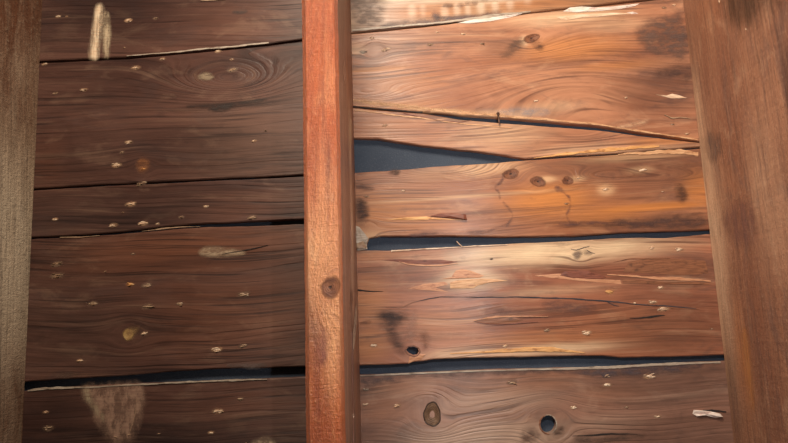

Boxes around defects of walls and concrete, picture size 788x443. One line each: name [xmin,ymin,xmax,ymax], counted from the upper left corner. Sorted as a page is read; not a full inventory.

leakage [91,5,110,59]
crack [353,99,698,140]
crack [358,289,449,308]
crack [474,296,699,319]